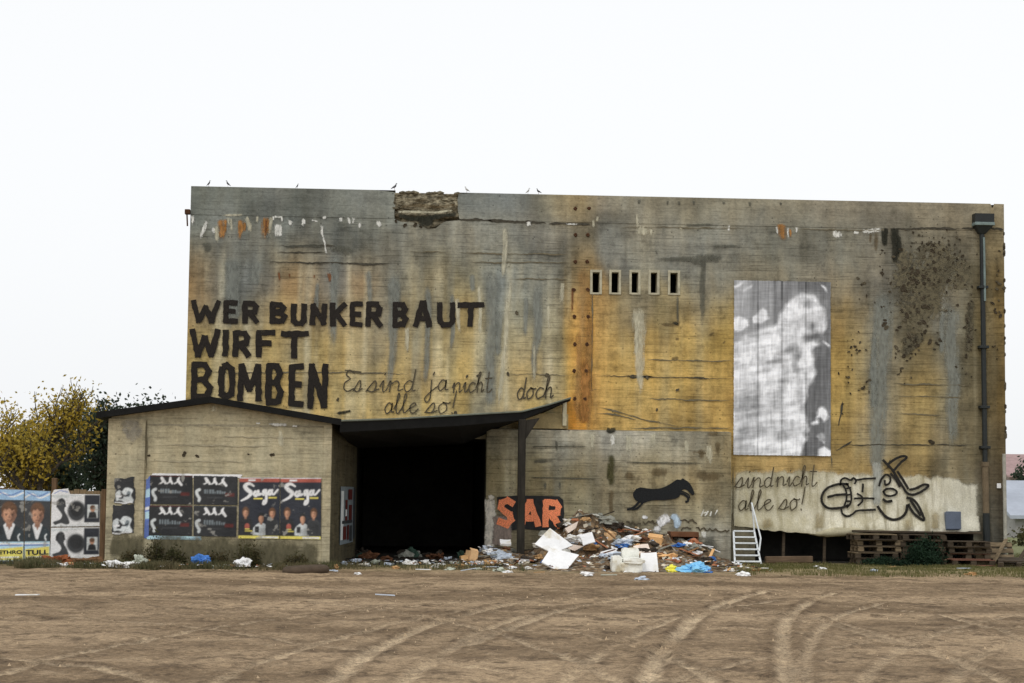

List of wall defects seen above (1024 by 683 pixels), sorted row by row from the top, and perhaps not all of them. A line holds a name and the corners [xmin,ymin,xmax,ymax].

corrosion [218,220,246,237]
spalling [392,190,461,229]
leakage [833,228,901,262]
leakage [656,245,737,316]